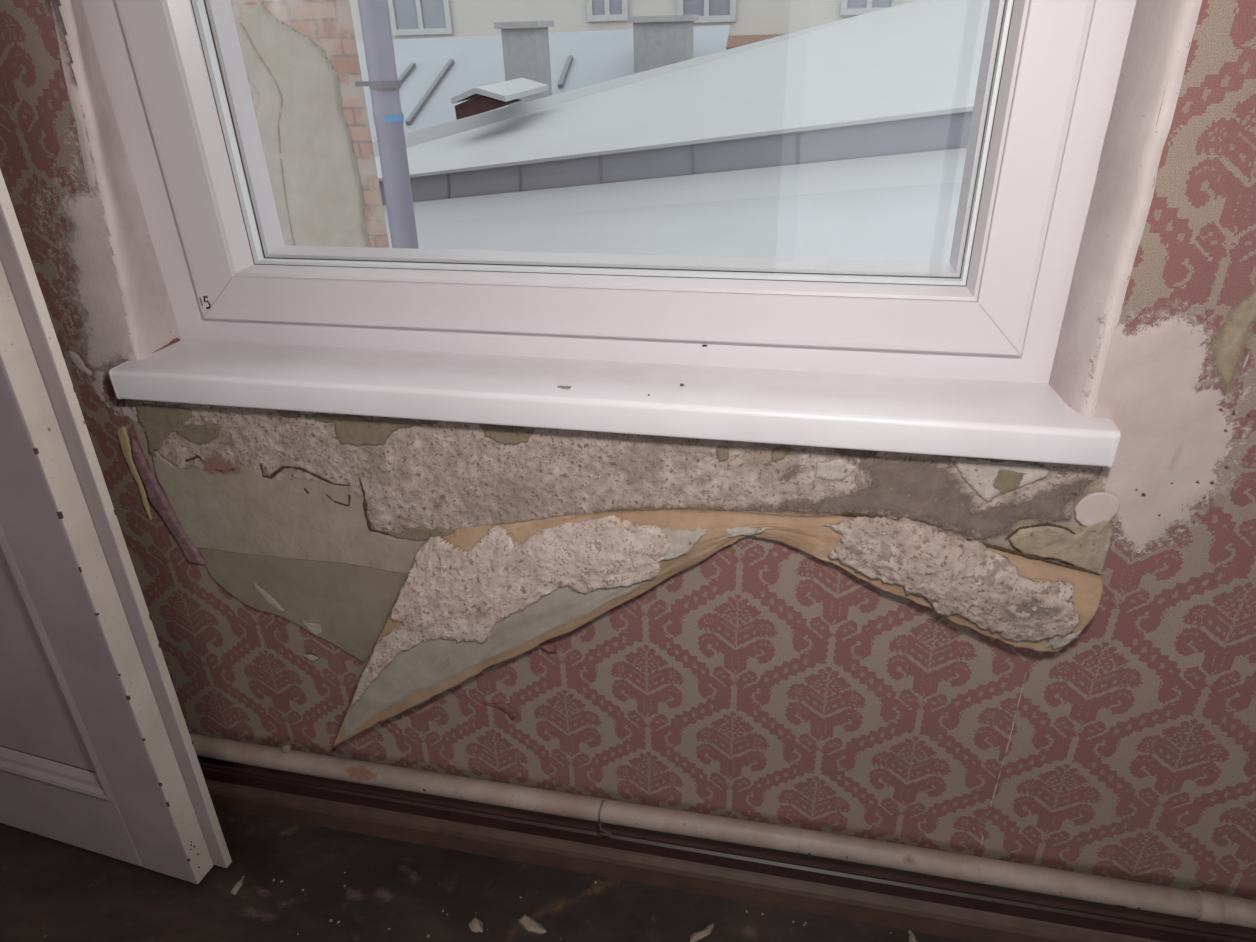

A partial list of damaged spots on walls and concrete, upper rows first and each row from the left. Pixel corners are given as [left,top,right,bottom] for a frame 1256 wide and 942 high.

crack [185,455,389,535]
spalling [125,399,1118,661]
crack [842,512,1100,576]